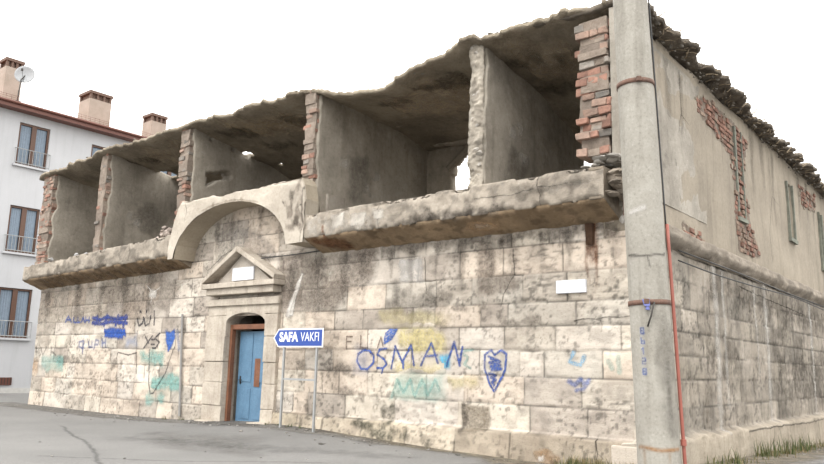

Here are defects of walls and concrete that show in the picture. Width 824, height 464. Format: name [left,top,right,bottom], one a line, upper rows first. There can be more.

flaking render [35,174,58,265]
flaking render [92,154,112,252]
flaking render [156,129,194,238]
flaking render [282,91,383,235]
flaking render [574,15,625,224]
spalling [682,222,705,242]
spalling [695,95,761,257]
spalling [798,184,816,211]